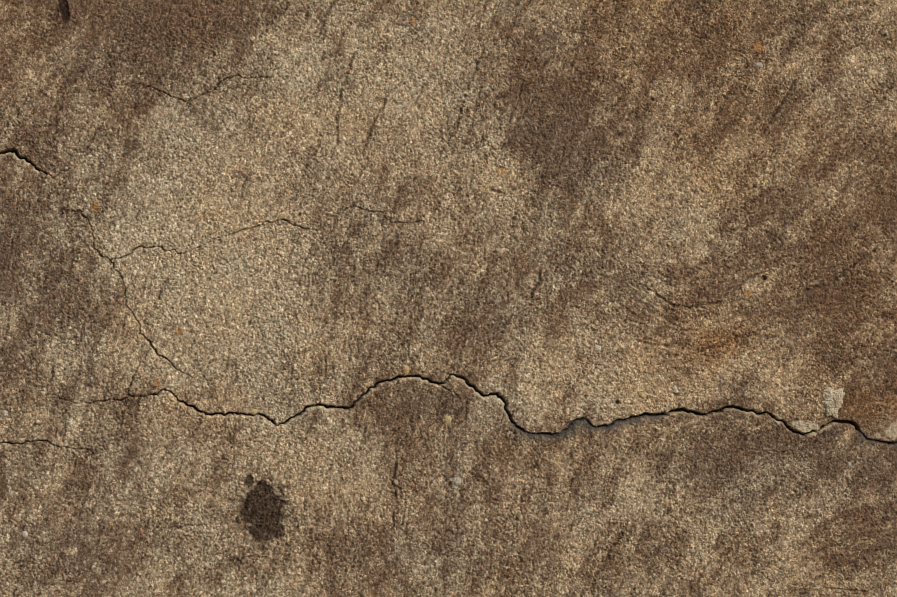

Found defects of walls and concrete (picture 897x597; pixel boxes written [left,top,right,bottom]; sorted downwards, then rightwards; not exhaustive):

crack [0,149,68,179]
crack [81,324,895,444]
crack [2,439,97,455]